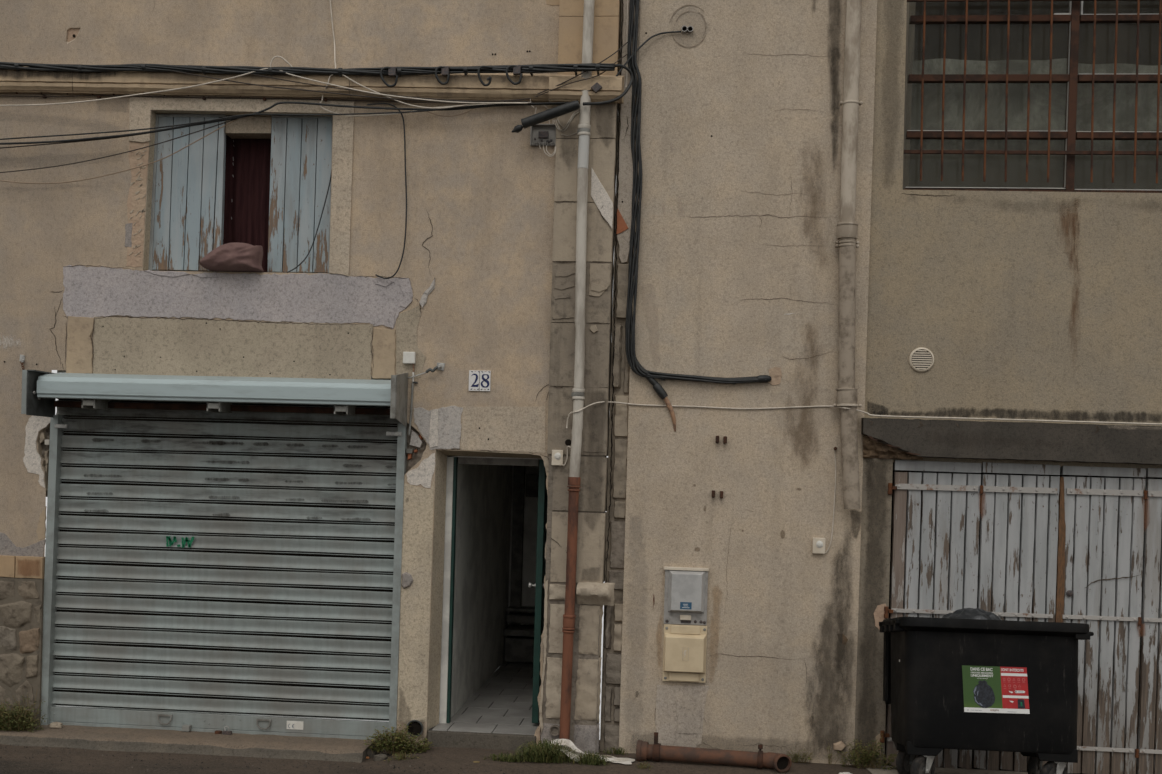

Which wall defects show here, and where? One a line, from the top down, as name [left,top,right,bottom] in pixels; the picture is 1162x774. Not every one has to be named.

spalling [125,142,228,278]
crack [354,212,435,312]
crack [691,169,827,247]
spalling [36,424,50,540]
water stain [812,463,886,757]